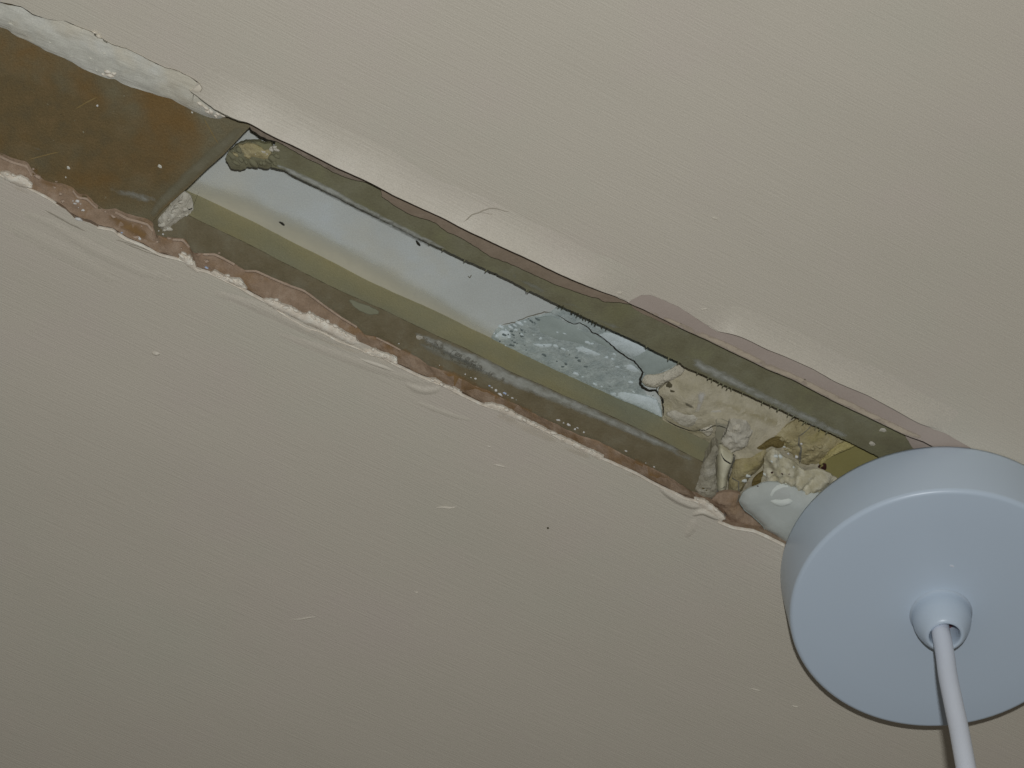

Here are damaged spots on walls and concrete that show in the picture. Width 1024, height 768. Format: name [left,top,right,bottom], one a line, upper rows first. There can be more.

flaking render [0,153,785,547]
peeling [629,295,970,448]